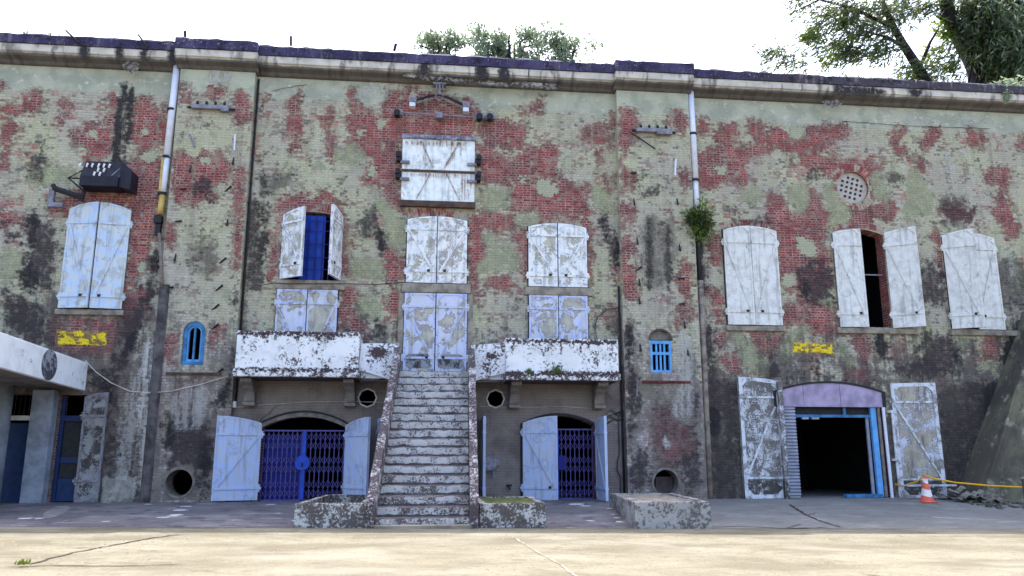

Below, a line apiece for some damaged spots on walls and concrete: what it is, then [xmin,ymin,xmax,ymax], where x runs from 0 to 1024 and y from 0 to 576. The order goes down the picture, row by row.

peeling [0,90,43,171]
damp [0,209,63,345]
damp [112,85,134,163]
peeling [46,93,248,358]
damp [87,160,390,501]
peeling [278,189,389,359]
peeling [320,72,643,307]
damp [674,321,741,499]
peeling [665,108,898,384]
peeling [887,123,943,173]
damp [872,329,997,489]
peeling [981,164,1021,241]